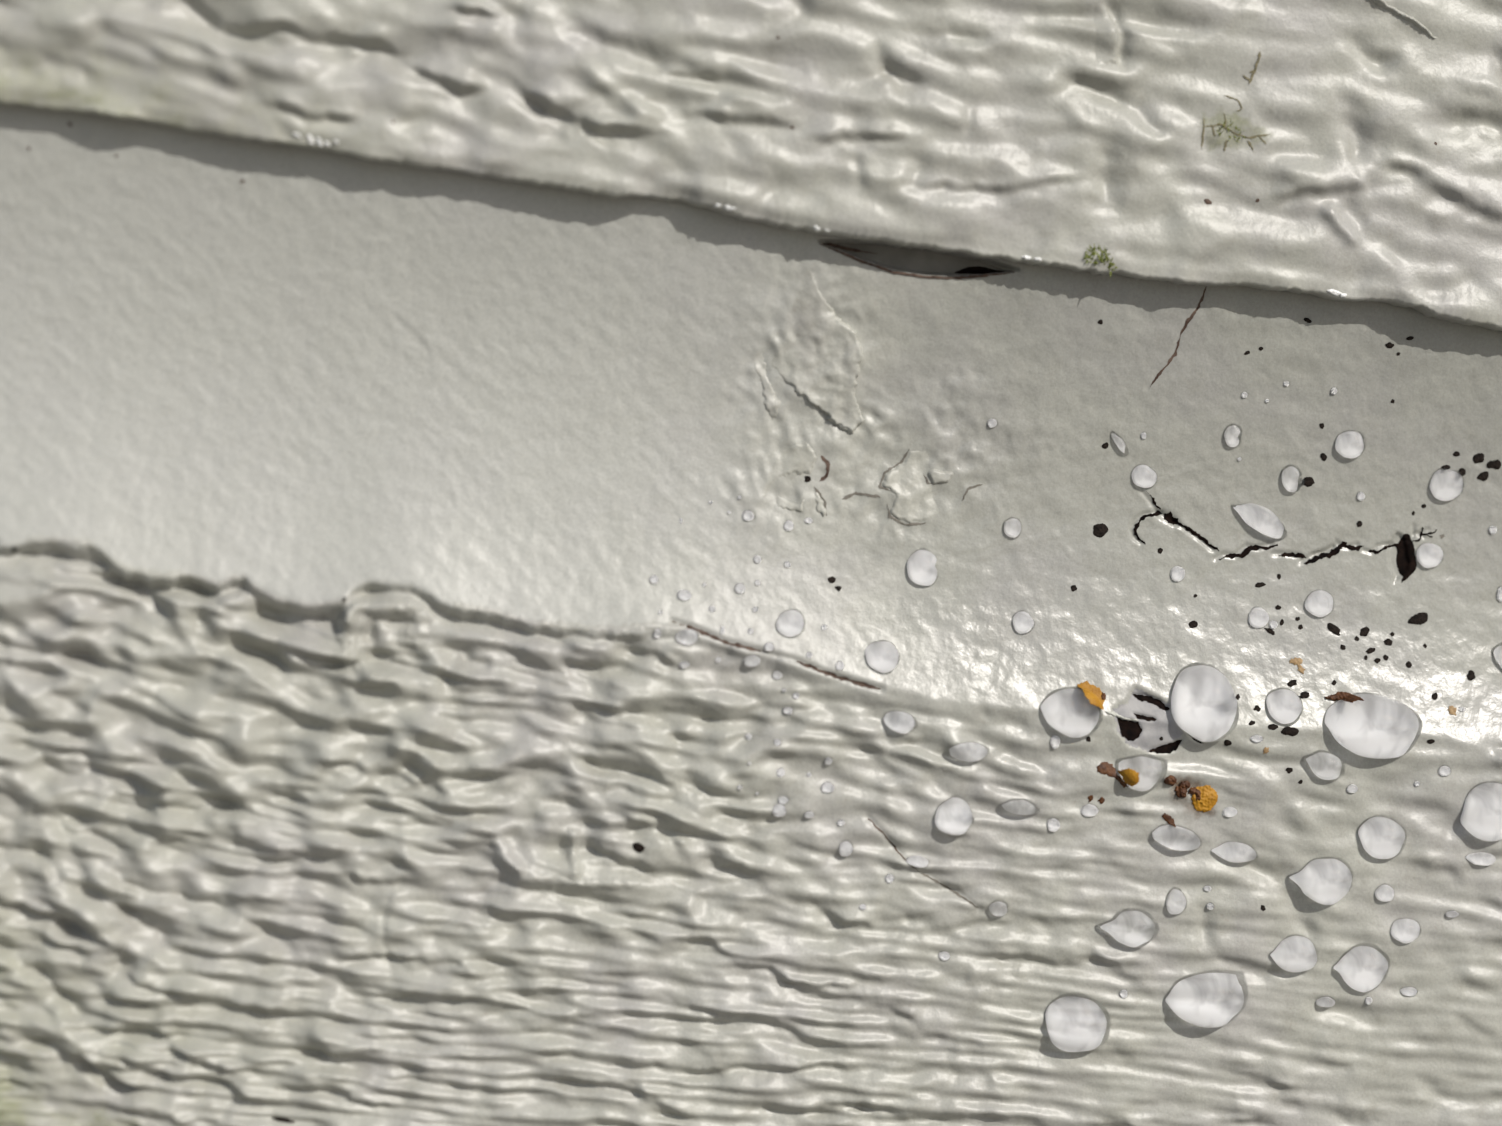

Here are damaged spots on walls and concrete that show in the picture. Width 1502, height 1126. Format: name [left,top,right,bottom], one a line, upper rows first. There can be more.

peeling [752,268,864,434]
crack [1150,286,1207,387]
peeling [762,443,830,517]
crack [1134,491,1445,582]
spalling [1104,688,1201,754]